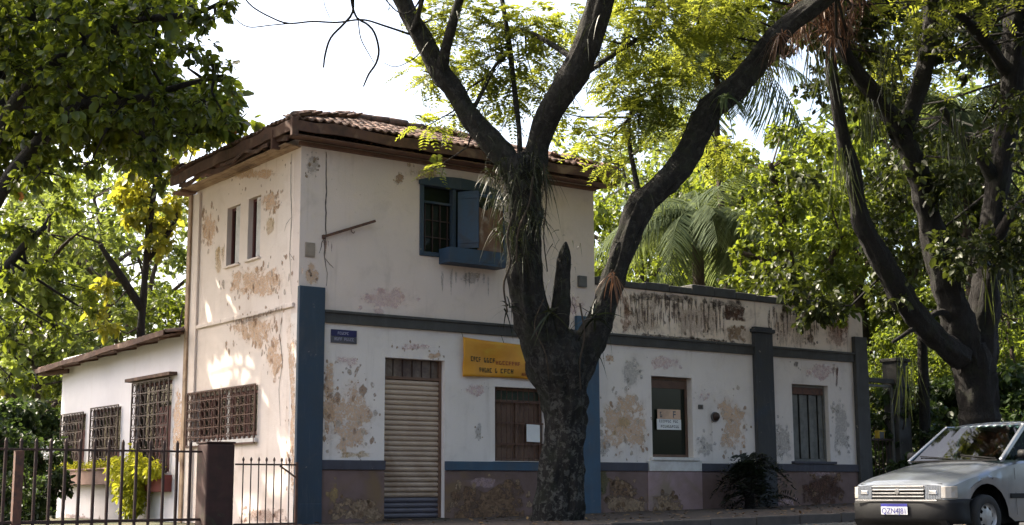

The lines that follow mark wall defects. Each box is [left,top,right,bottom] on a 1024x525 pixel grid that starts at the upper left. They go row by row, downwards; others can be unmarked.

crack [319,153,332,285]
damp [620,292,748,344]
peeling [219,254,303,491]
peeling [323,358,381,459]
peeling [600,386,652,461]
peeling [711,400,752,459]